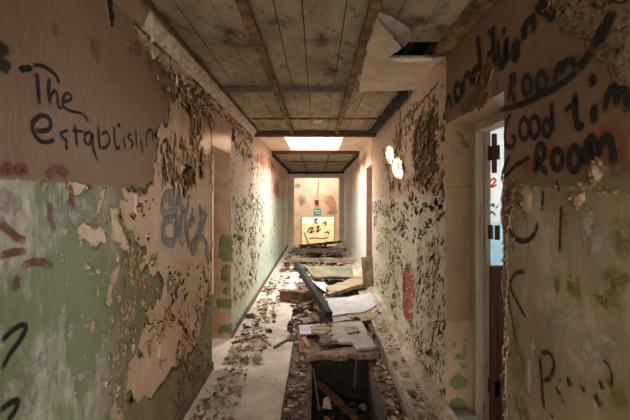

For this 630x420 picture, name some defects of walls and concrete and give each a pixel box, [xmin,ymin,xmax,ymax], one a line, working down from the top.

flaking render [532,0,630,91]
peeling [61,20,286,420]
peeling [371,93,447,397]